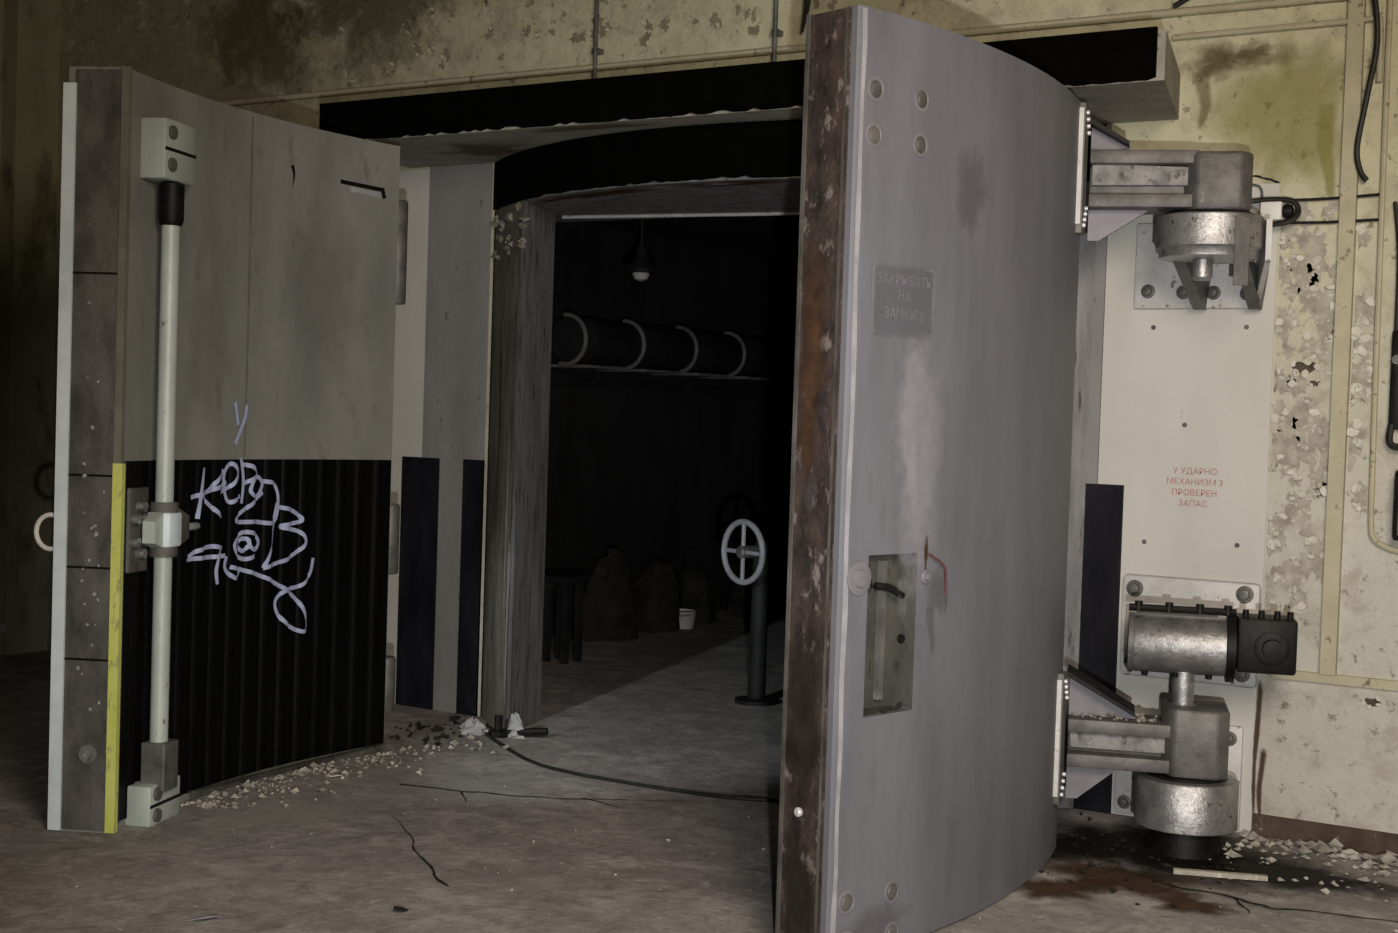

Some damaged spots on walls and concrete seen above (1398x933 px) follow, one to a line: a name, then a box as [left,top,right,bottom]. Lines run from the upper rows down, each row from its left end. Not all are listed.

damp [1244,68,1333,194]
rust [786,642,816,809]
crack [389,784,727,886]
rust [1022,860,1224,914]